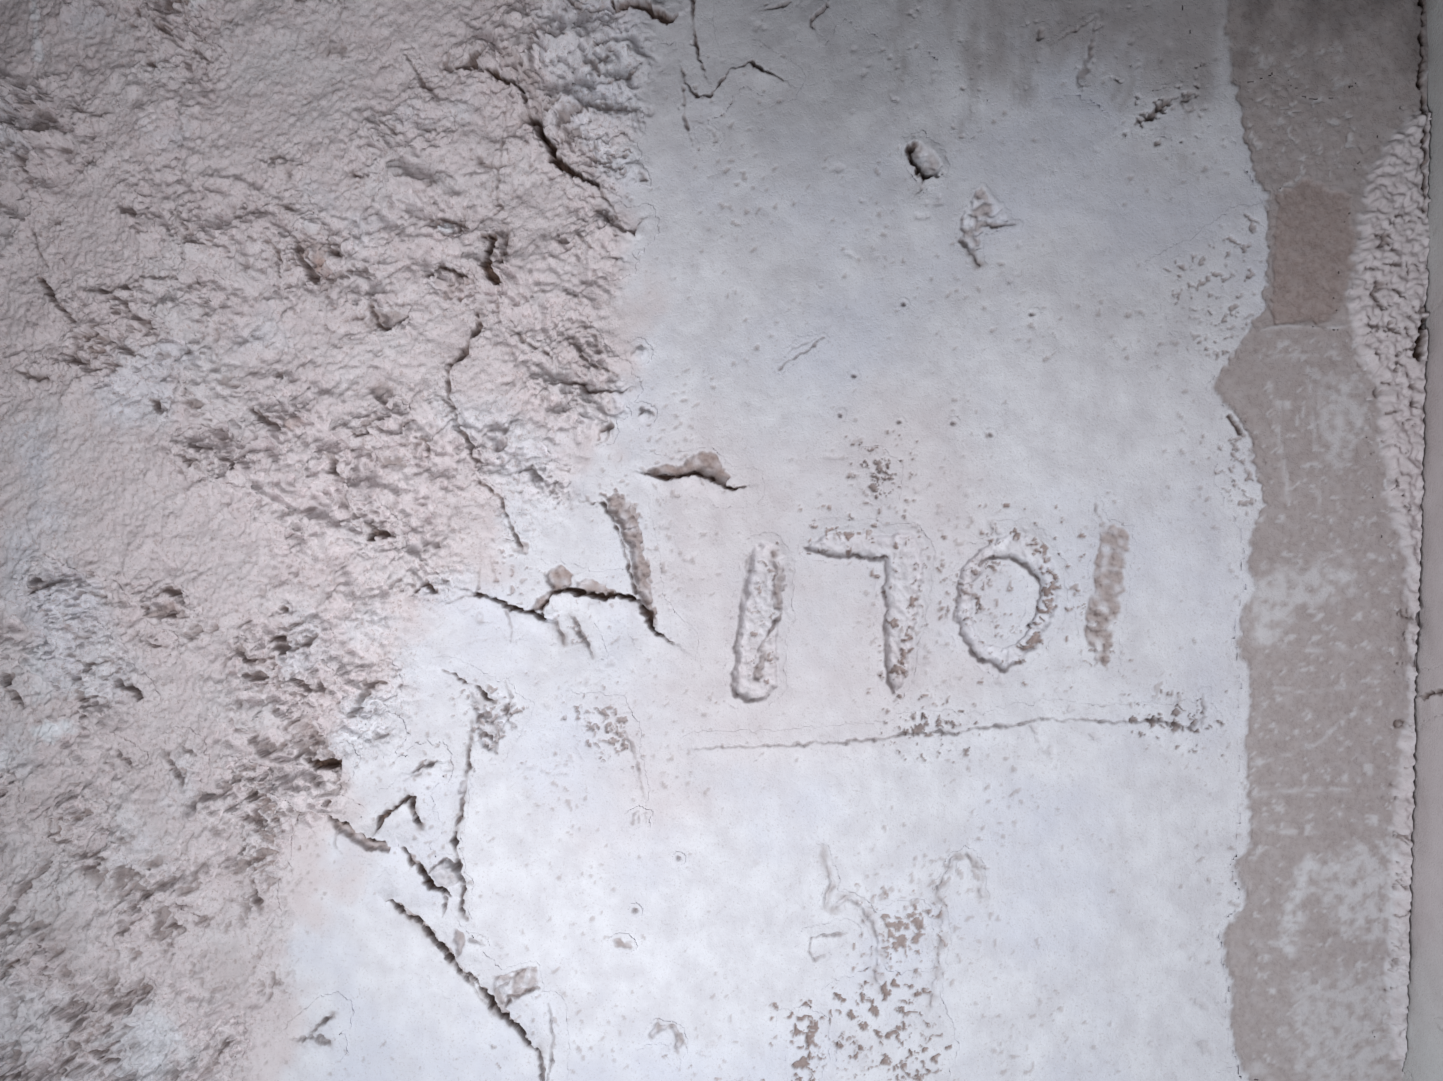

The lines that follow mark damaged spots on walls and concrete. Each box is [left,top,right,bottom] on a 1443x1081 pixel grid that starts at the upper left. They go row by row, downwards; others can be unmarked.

crack [305,0,850,1081]
peeling [1119,69,1214,140]
peeling [1144,68,1427,1081]
crack [1414,664,1443,723]